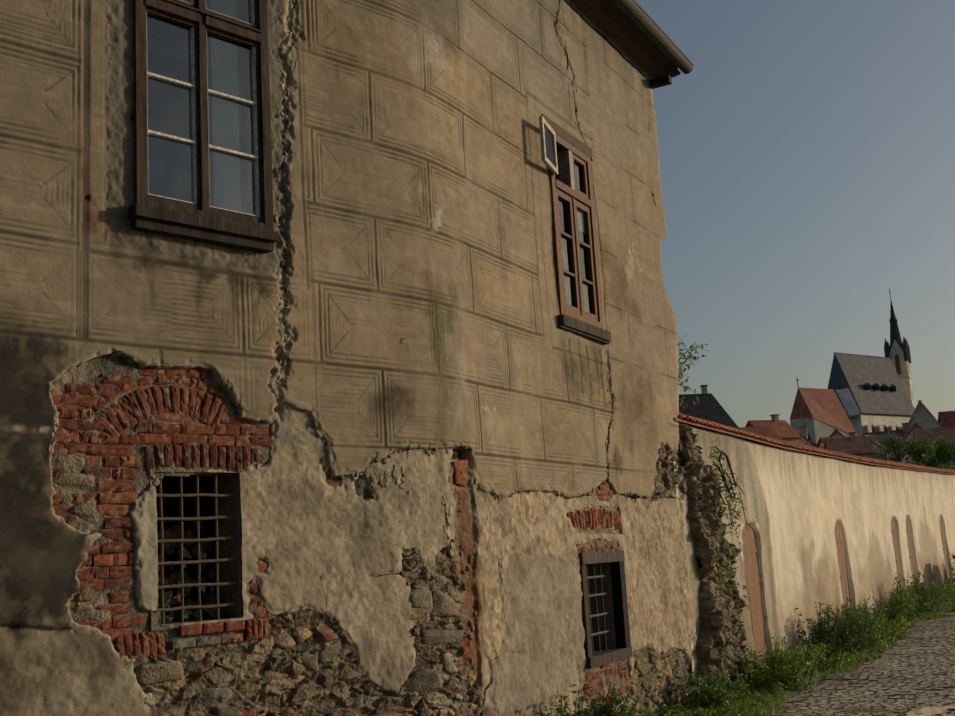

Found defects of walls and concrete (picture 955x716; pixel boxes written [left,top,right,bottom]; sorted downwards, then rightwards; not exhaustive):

crack [274,0,314,418]
crack [554,0,593,162]
crack [593,186,645,499]
flaking render [48,355,273,663]